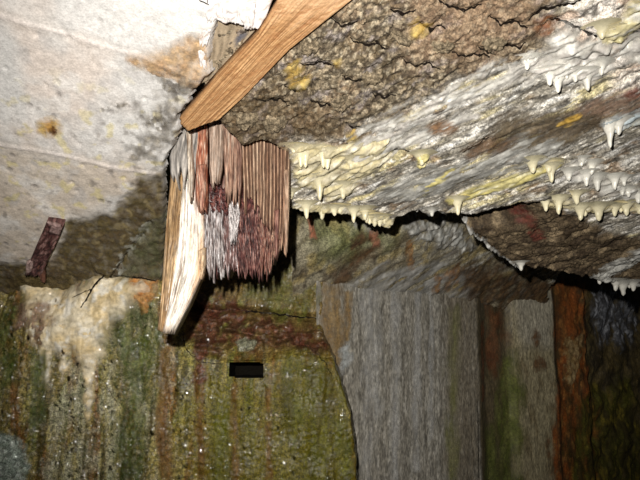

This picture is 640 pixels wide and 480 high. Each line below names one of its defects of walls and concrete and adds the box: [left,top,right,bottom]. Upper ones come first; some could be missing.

crack [330,17,388,50]
crack [390,9,446,33]
crack [439,0,598,58]
rust [38,121,57,134]
water stain [131,37,208,160]
crack [256,85,331,107]
crack [300,61,361,82]
water stain [277,0,640,310]
crack [74,221,155,307]
rust [130,278,156,313]
water stain [32,352,46,423]
rust [551,279,601,480]